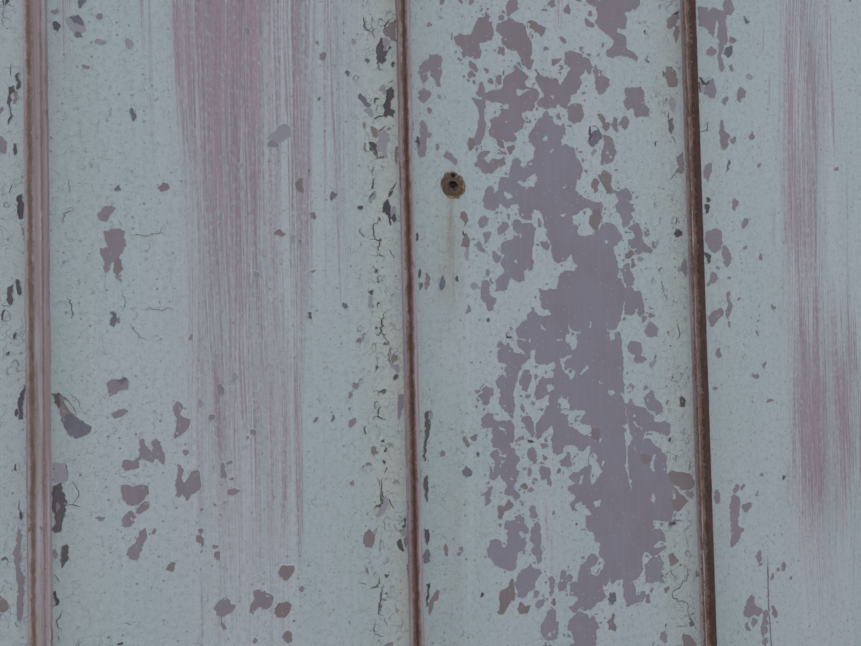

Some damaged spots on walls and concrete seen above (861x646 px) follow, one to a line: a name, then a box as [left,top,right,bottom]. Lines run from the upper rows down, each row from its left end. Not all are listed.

peeling [362,0,397,71]
peeling [0,65,22,125]
peeling [409,53,458,177]
rust [441,171,465,199]
peeling [450,0,697,646]
peeling [51,392,93,439]
peeling [51,462,81,533]
peeling [119,484,157,562]
peeling [121,438,202,502]
peeling [714,483,759,548]
peeling [0,501,26,627]
peeling [249,588,296,644]